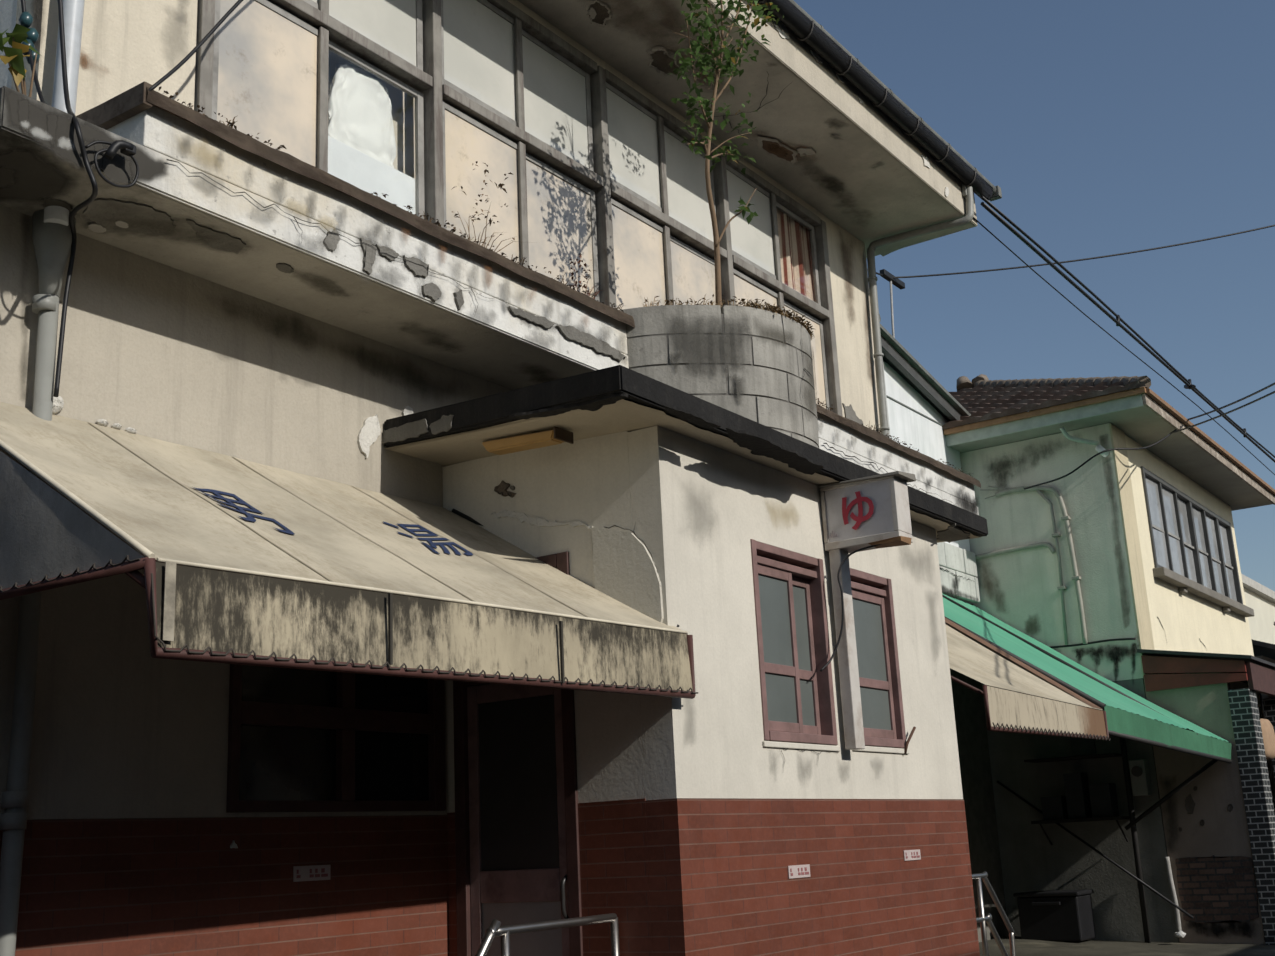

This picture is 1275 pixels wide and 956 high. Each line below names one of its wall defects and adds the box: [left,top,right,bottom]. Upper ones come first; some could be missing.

spalling [585,0,613,28]
damp [0,90,167,214]
peeling [323,228,340,251]
peeling [359,238,464,311]
damp [671,319,749,402]
peeling [357,406,454,458]
crack [605,523,657,569]
damp [1076,644,1135,677]